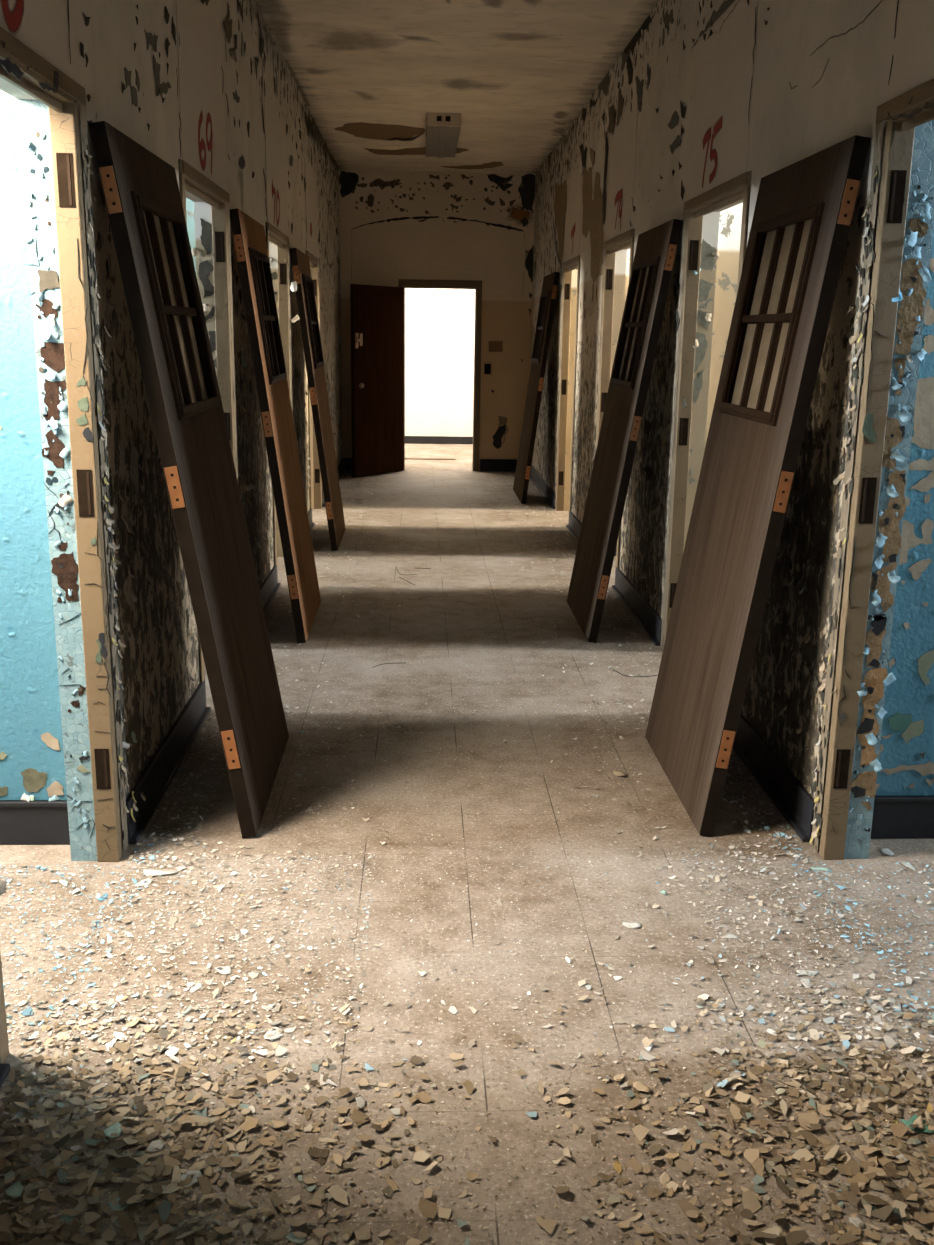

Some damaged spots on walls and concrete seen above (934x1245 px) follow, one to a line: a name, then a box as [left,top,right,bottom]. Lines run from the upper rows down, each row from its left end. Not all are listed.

peeling [19,132,49,178]
peeling [24,189,51,244]
peeling [121,67,150,131]
peeling [134,4,176,103]
peeling [191,218,217,368]
flaking render [223,0,749,628]
peeling [34,145,147,822]
peeling [0,471,934,1245]